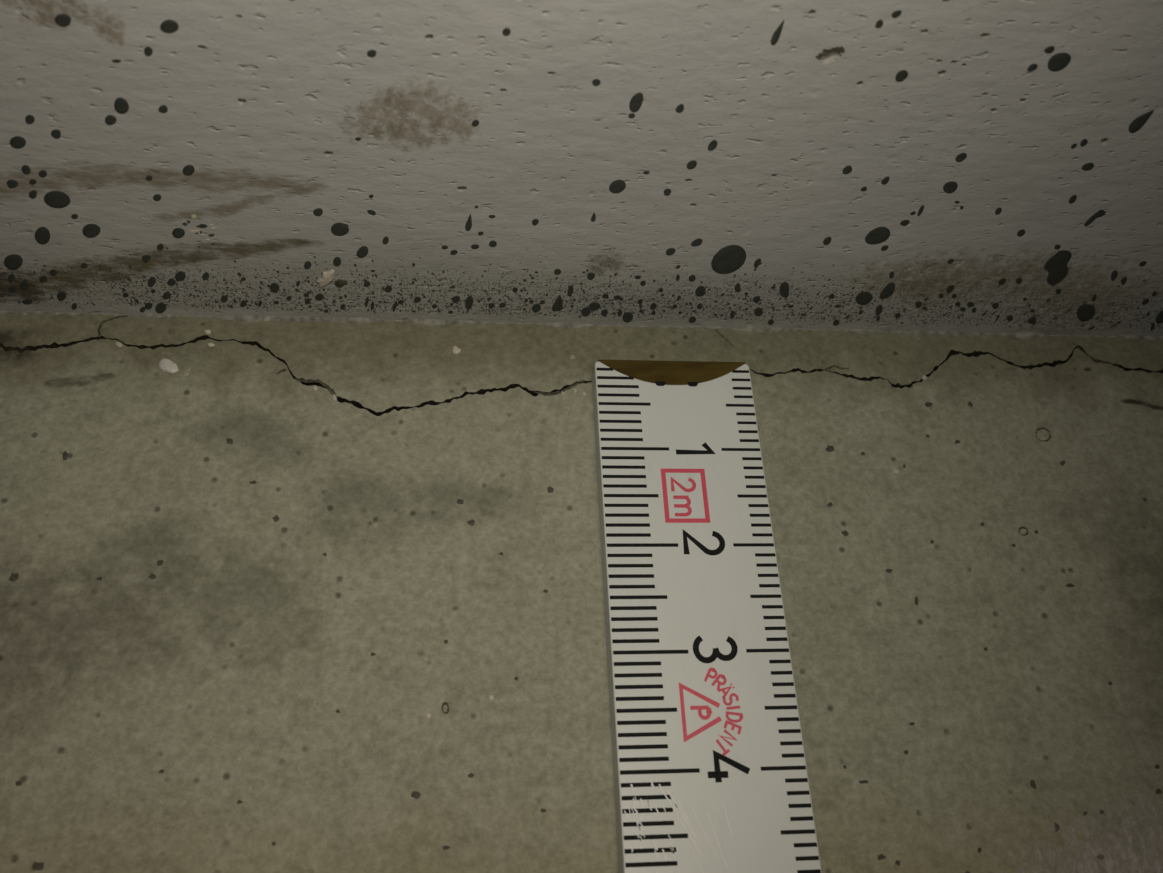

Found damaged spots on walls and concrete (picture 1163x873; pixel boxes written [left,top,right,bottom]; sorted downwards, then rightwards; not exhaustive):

water stain [0,239,310,300]
crack [0,315,592,416]
crack [714,329,1163,389]